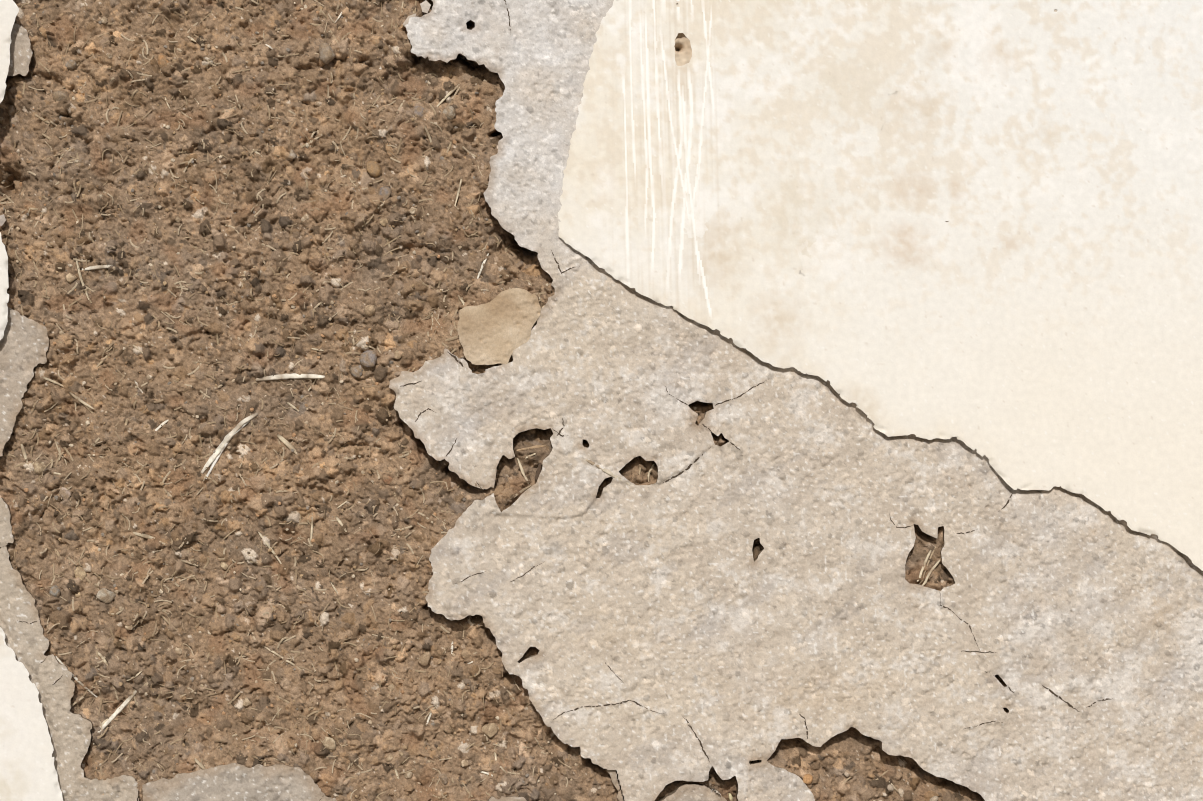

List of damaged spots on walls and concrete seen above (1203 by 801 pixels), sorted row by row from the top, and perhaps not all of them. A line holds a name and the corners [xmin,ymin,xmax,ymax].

spalling [0,0,619,801]
peeling [389,0,1203,801]